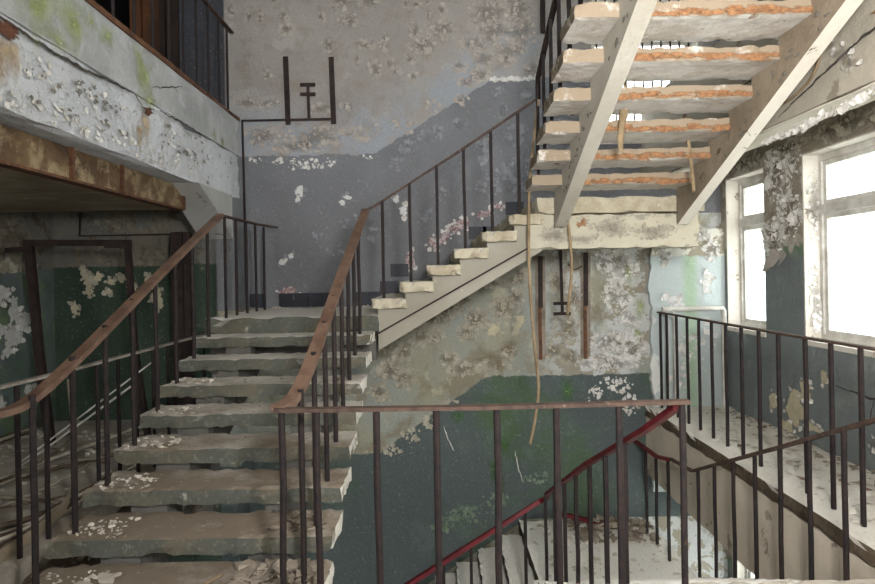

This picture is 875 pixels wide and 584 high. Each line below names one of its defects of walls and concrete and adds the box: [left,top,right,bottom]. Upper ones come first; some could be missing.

corrosion [652,4,813,16]
corrosion [617,90,754,101]
corrosion [634,52,780,61]
crack [778,27,875,118]
peeling [395,0,542,270]
corrosion [594,152,711,161]
corrosion [605,123,730,133]
peeling [727,84,875,272]
spalling [0,285,31,360]
peeling [538,218,678,416]
spalling [769,370,829,434]
crack [835,385,875,427]